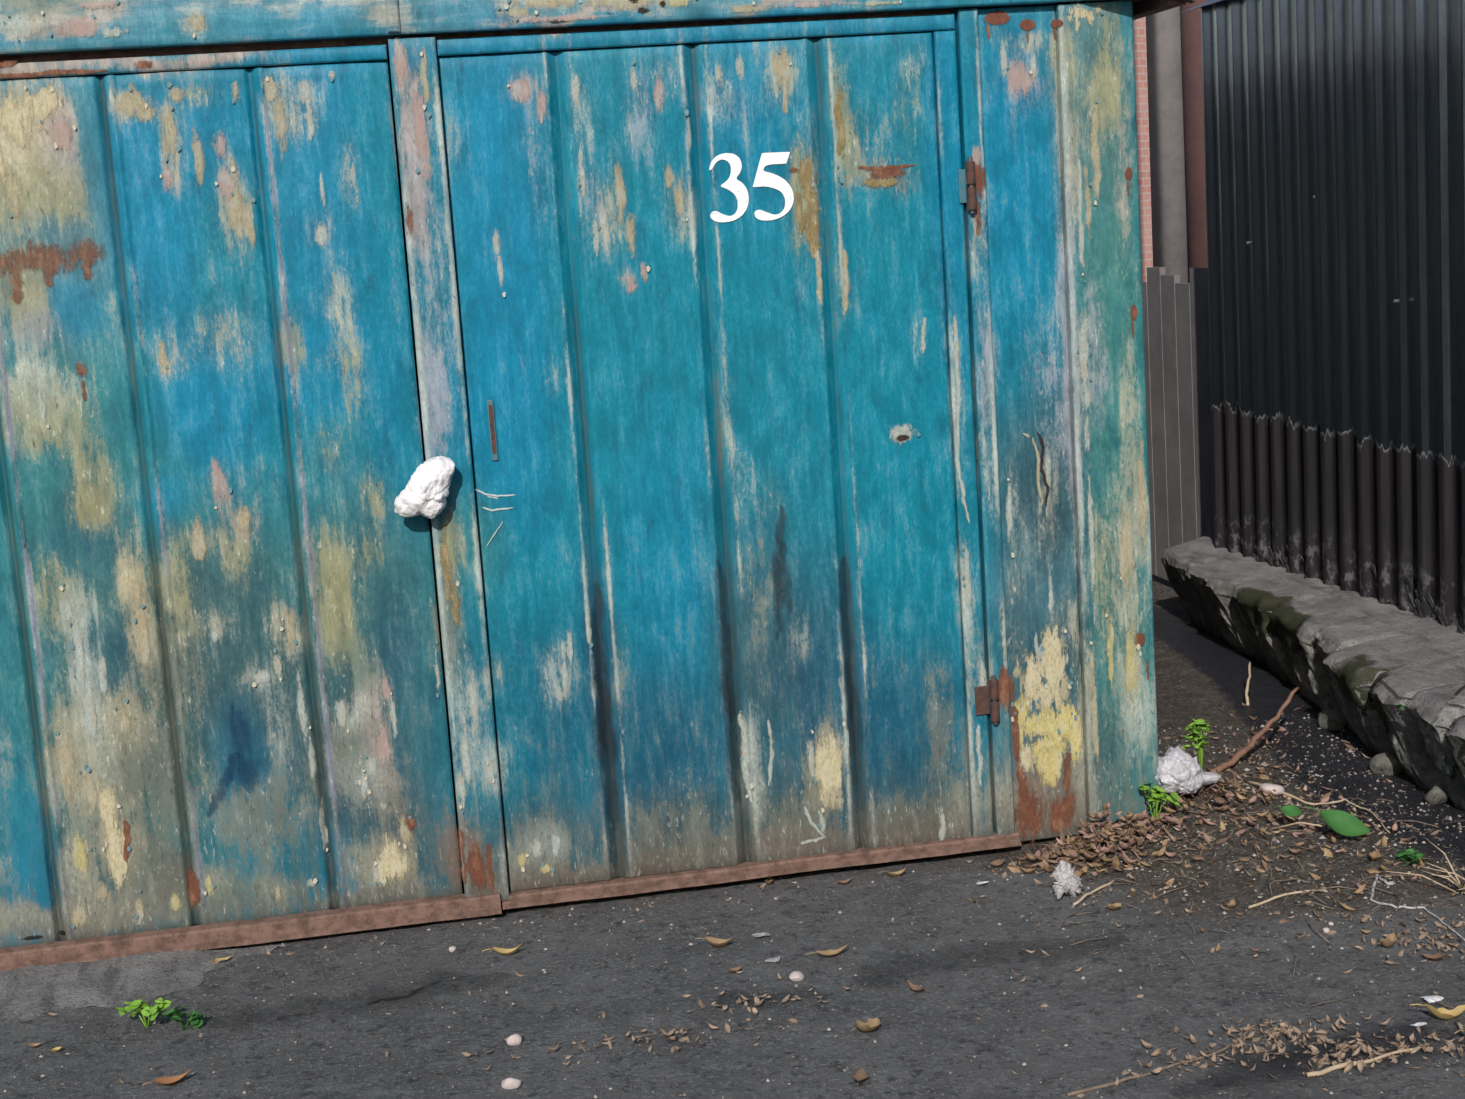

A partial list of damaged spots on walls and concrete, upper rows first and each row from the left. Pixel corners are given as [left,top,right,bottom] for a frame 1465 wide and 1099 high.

peeling [497,0,688,23]
corrosion [985,10,1063,43]
peeling [0,84,77,217]
corrosion [858,164,915,188]
corrosion [966,147,986,236]
corrosion [0,239,102,304]
crack [1023,432,1050,506]
peeling [1006,478,1015,558]
peeling [59,583,130,740]
peeling [1011,477,1142,788]
corrosion [997,667,1075,839]
peeling [56,730,144,924]